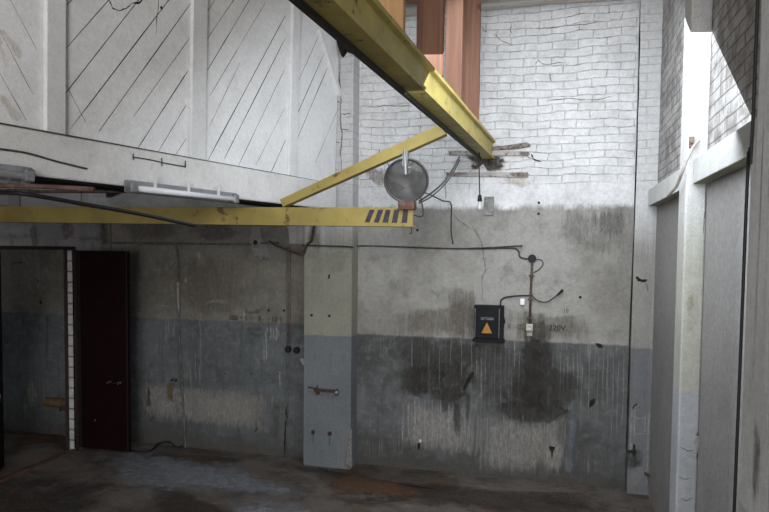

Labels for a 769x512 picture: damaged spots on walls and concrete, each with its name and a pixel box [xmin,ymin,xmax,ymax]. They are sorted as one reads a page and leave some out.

spalling [446,142,530,178]